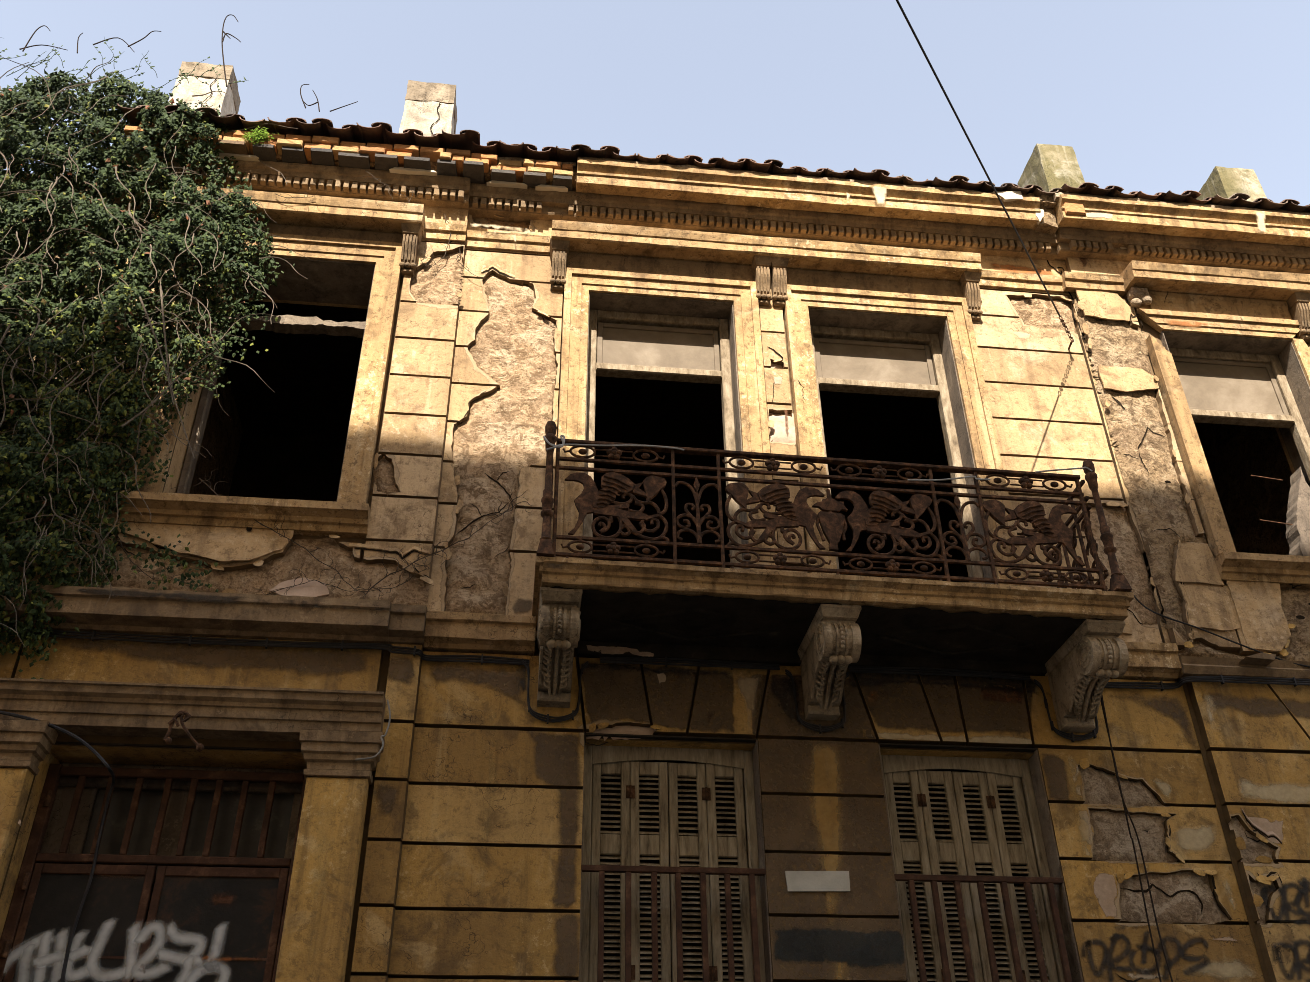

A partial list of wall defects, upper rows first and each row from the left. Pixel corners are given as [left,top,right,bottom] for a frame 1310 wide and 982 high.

spalling [83,244,560,615]
spalling [1005,292,1245,659]
crack [1127,528,1194,638]
spalling [1264,588,1310,662]
damp [527,731,580,982]
damp [582,663,1037,980]
damp [1042,754,1068,800]
spalling [1071,758,1237,941]
spalling [1228,814,1284,928]
peeling [1241,782,1310,802]
peeling [1195,962,1252,977]